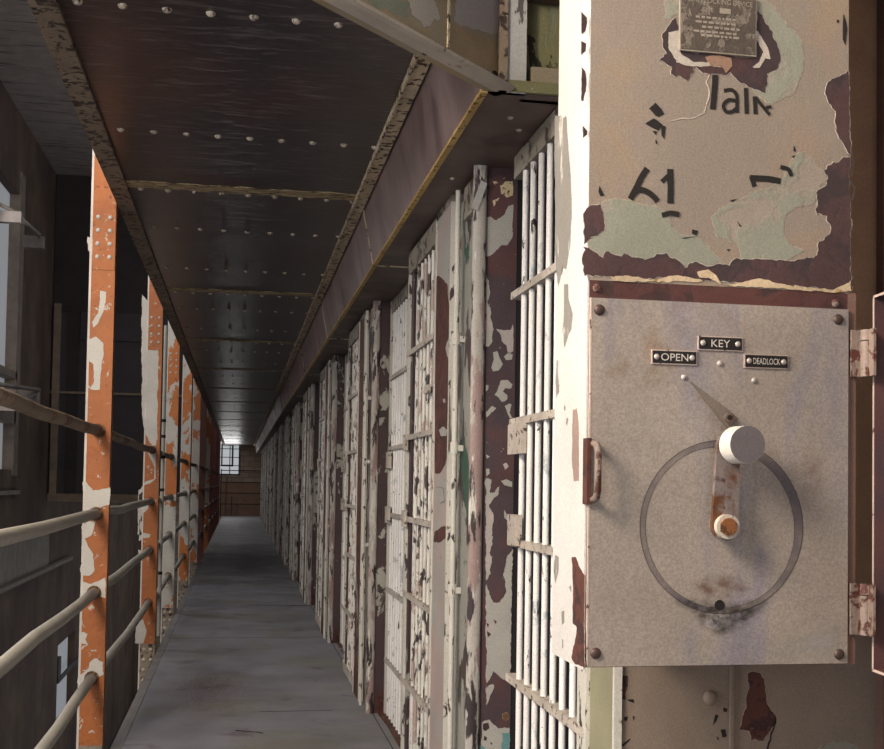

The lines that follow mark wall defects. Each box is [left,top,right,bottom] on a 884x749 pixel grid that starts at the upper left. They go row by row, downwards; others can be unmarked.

peeling [580,12,588,55]
peeling [554,115,573,348]
peeling [581,70,856,294]
peeling [89,290,106,390]
peeling [435,276,450,474]
peeling [485,276,514,418]
peeling [555,360,579,482]
peeling [80,482,111,598]
peeling [484,454,513,707]
peeling [77,658,104,685]
peeling [479,719,510,749]
peeling [739,671,777,742]